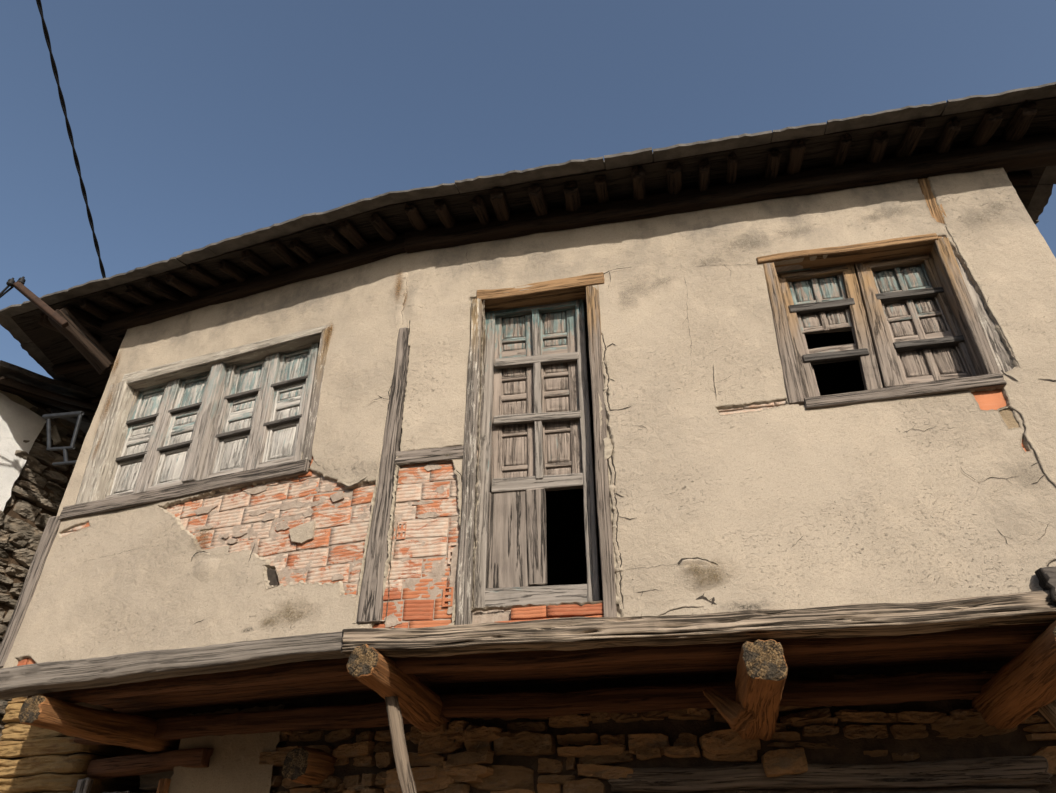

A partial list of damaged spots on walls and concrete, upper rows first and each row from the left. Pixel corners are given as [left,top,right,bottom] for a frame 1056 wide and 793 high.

flaking render [58,520,91,538]
flaking render [157,410,388,623]
flaking render [369,346,463,628]
flaking render [468,296,624,623]
crack [601,335,646,428]
crack [609,455,728,616]
flaking render [941,234,1031,453]
crack [945,226,1056,487]
crack [1037,521,1056,566]